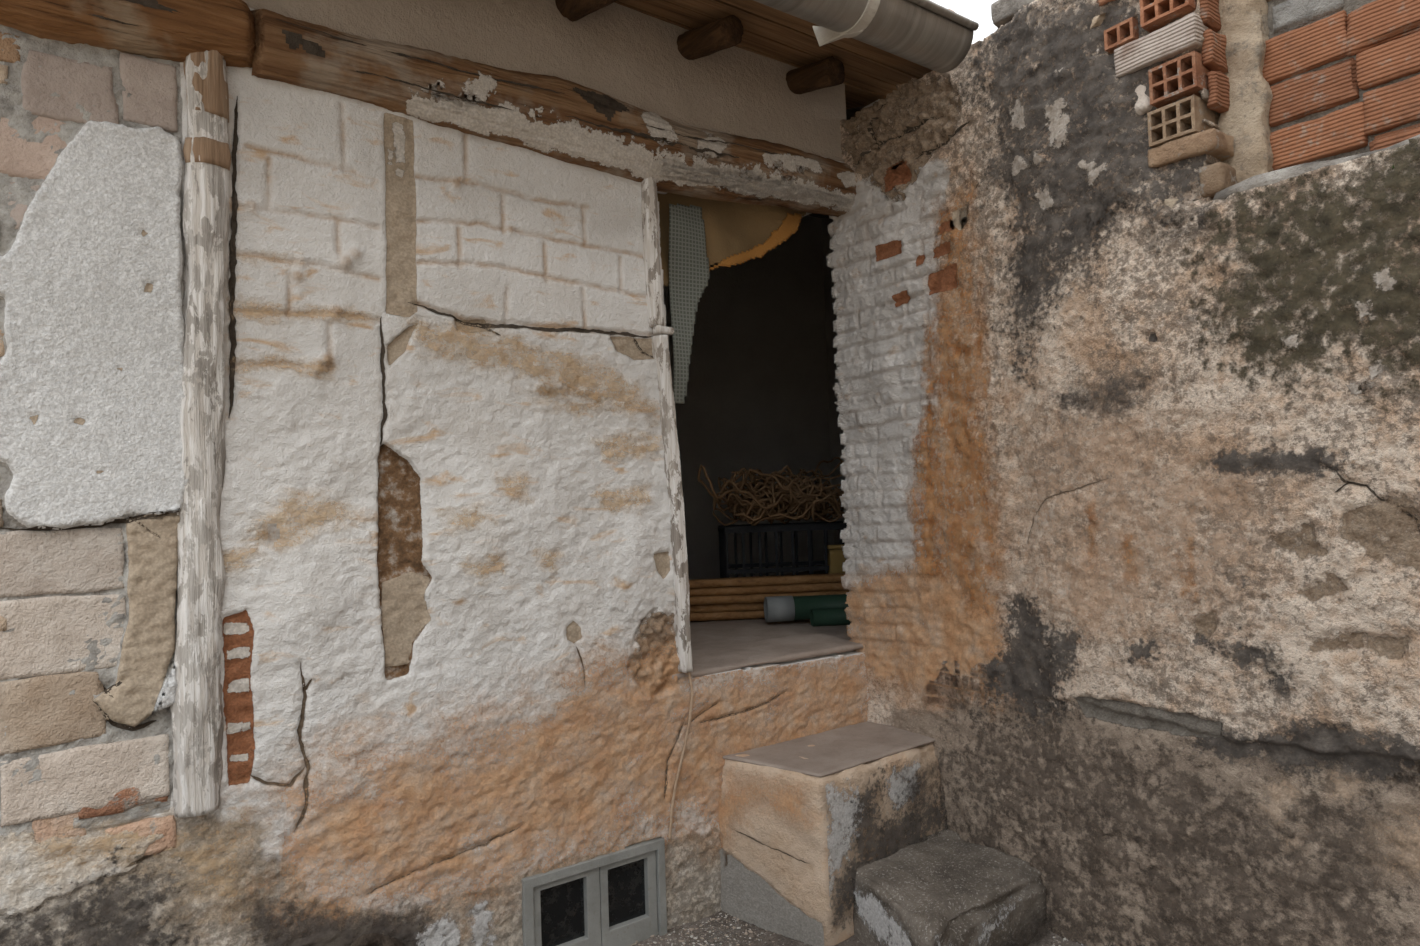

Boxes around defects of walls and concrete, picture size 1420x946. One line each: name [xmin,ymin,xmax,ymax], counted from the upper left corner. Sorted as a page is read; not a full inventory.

peeling [383,71,968,365]
damp [960,0,1420,412]
damp [234,303,364,320]
crack [380,302,653,447]
damp [416,323,655,412]
peeling [377,444,432,680]
crack [1320,465,1420,533]
damp [223,369,1355,946]
damp [1192,718,1420,786]
damp [0,828,237,946]